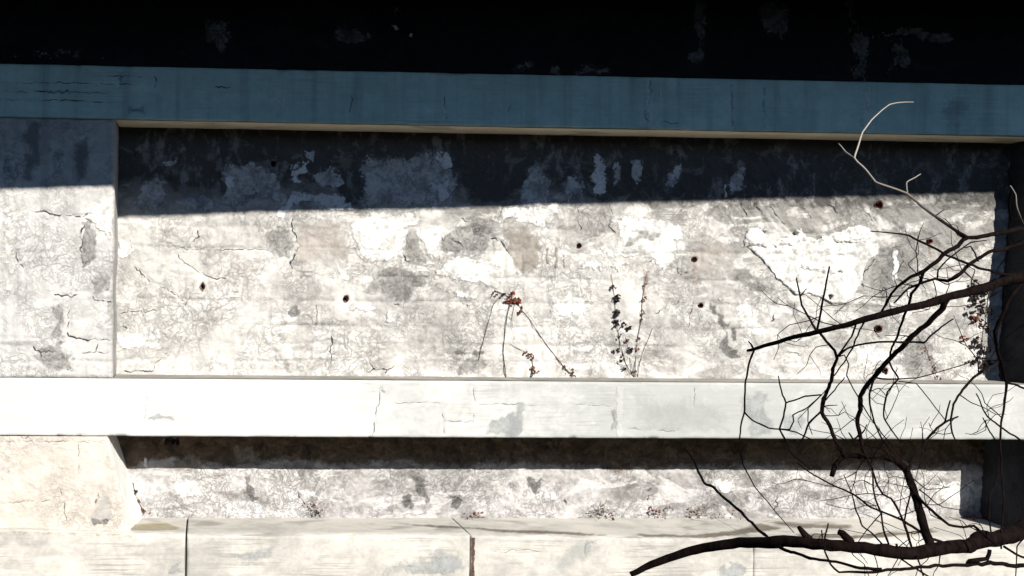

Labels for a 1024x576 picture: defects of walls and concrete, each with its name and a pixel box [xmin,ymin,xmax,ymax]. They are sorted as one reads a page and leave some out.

crack [1,76,157,103]
water stain [589,153,644,194]
water stain [724,165,746,198]
crack [37,210,92,264]
peeling [183,150,502,299]
crack [366,363,458,436]